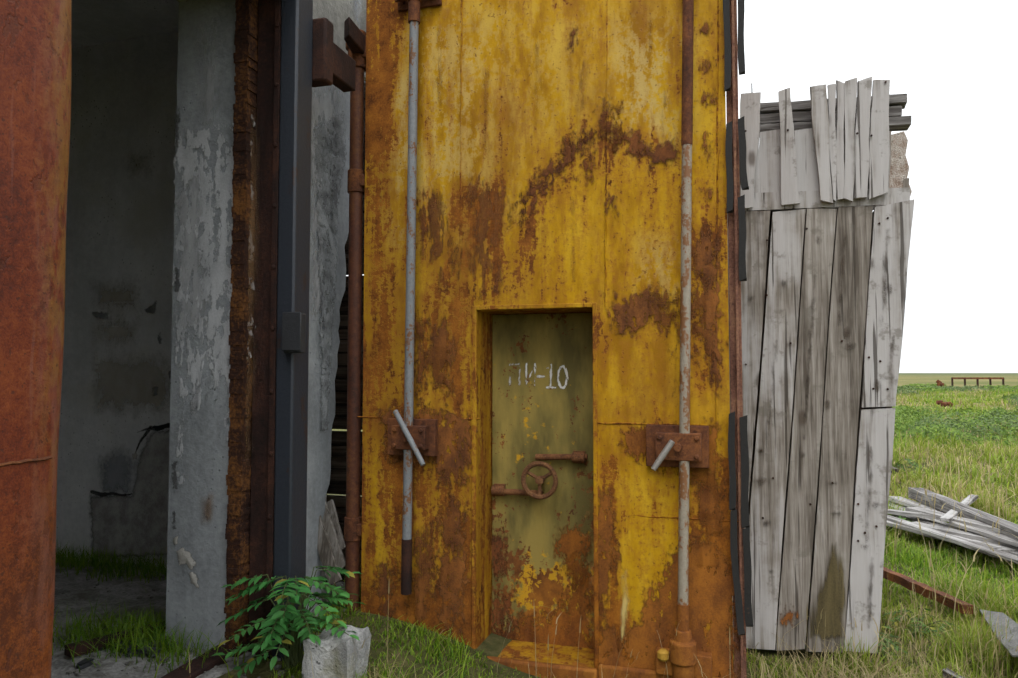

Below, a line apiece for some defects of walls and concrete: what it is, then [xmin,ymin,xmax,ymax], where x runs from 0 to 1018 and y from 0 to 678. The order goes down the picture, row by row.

rust [417,97,680,298]
peeling [90,109,234,588]
rust [607,229,729,396]
crack [90,489,132,497]
crack [135,423,170,453]
rust [491,418,745,678]
leakage [780,610,799,626]
leakage [810,544,845,640]